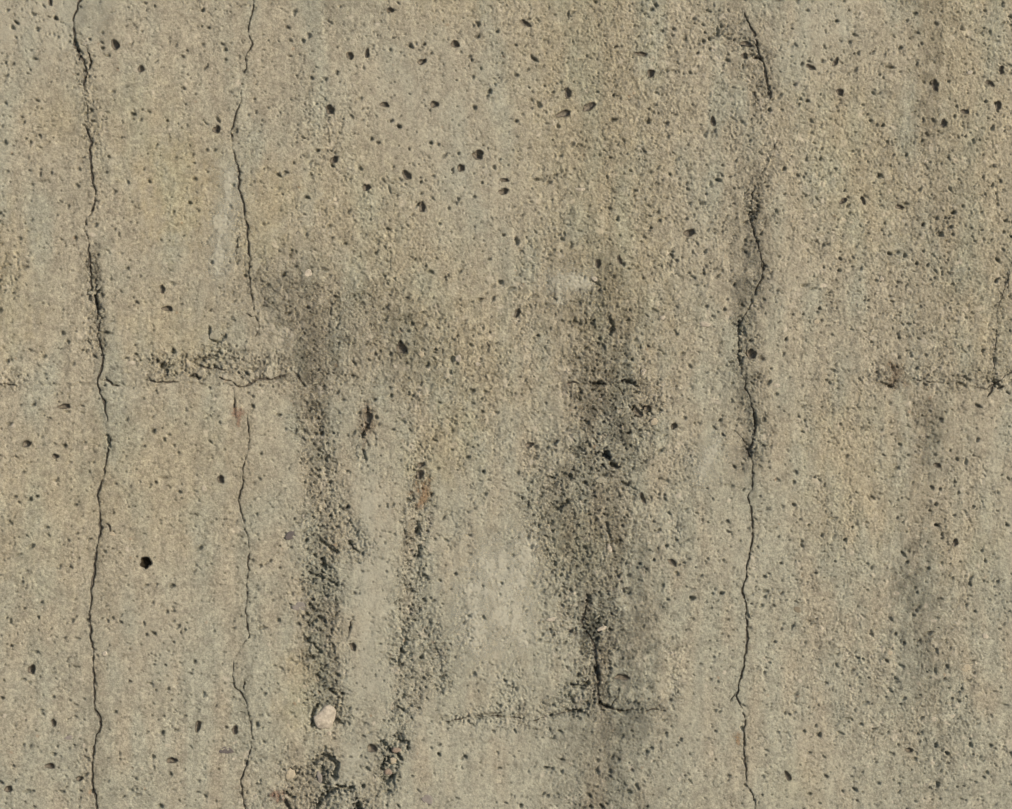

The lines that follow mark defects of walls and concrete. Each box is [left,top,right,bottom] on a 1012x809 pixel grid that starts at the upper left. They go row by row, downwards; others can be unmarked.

crack [72,0,118,809]
crack [144,364,304,809]
crack [231,4,258,337]
crack [447,593,665,730]
water stain [541,263,601,304]
crack [730,142,777,805]
crack [744,9,772,106]